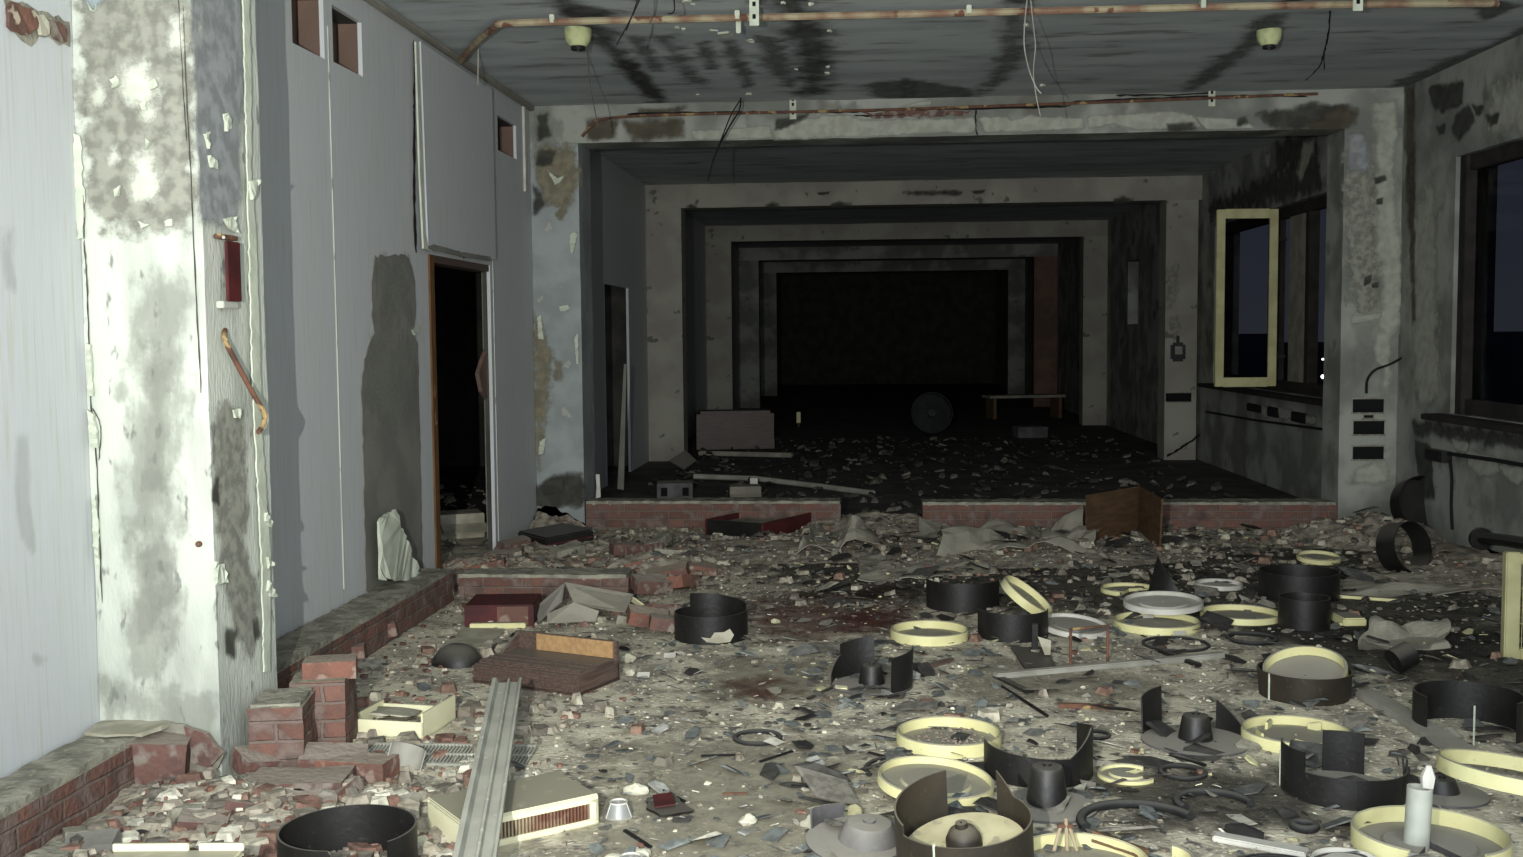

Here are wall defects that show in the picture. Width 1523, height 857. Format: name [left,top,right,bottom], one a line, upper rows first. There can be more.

spalling [291,0,359,75]
spalling [497,117,514,158]
leakage [555,0,832,141]
leakage [868,0,1027,99]
leakage [1168,122,1194,132]
peeling [1429,75,1523,140]
flaking render [533,143,582,254]
peeling [3,0,278,672]